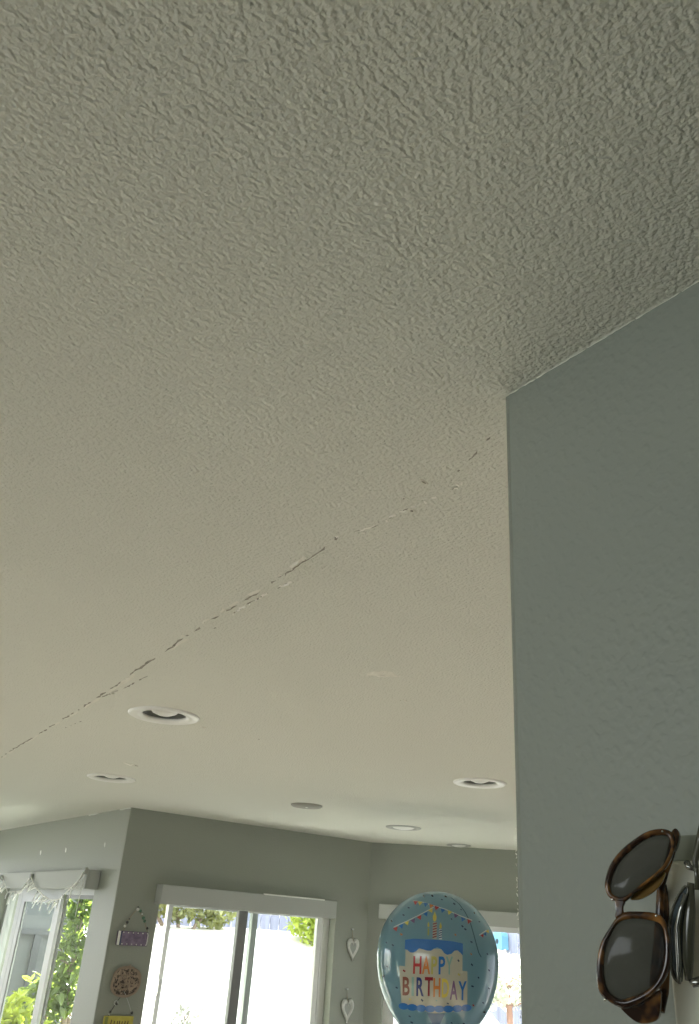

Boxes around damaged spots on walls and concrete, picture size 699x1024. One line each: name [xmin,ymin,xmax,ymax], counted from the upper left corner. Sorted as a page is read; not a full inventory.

crack [2,437,490,758]